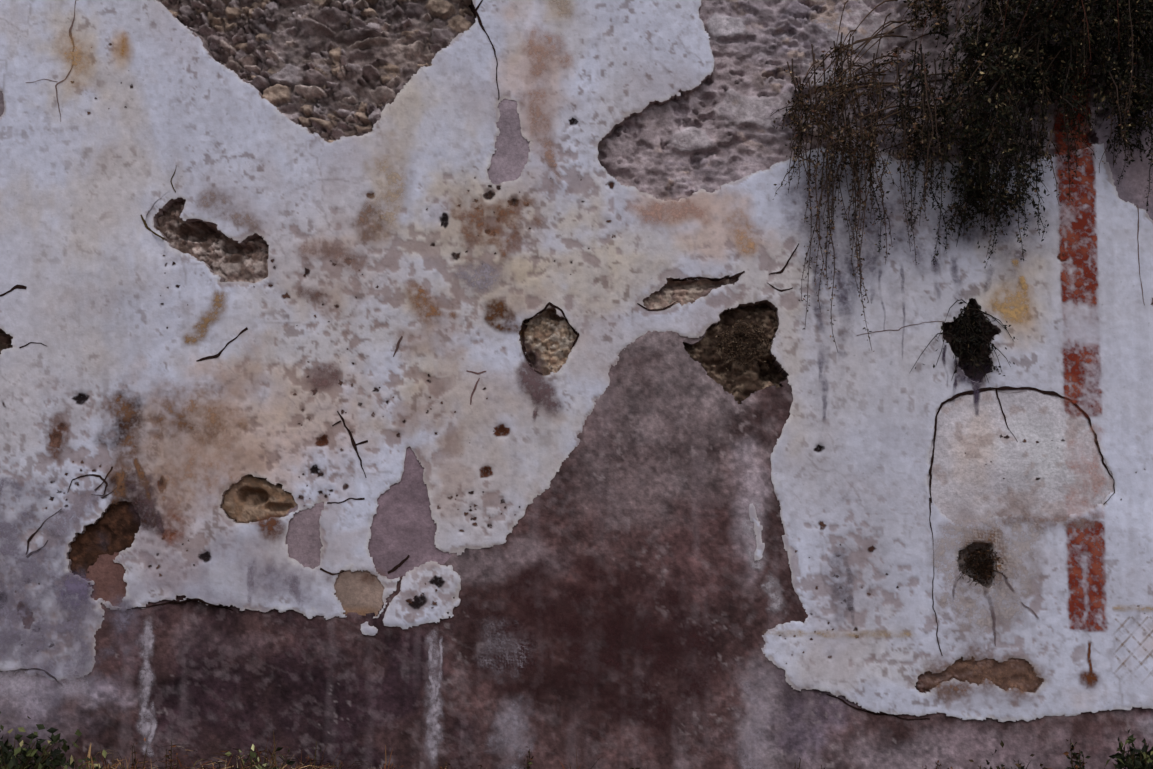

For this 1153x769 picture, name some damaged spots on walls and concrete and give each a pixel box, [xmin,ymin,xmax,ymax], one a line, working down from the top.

spalling [159,0,477,143]
spalling [598,0,1153,220]
spalling [156,201,290,305]
spalling [643,278,738,311]
leakage [0,493,98,702]
leakage [48,419,69,458]
leakage [108,393,164,532]
flaking render [0,299,1153,769]
crack [929,386,1115,656]
leakage [140,622,157,755]
leakage [427,631,443,759]